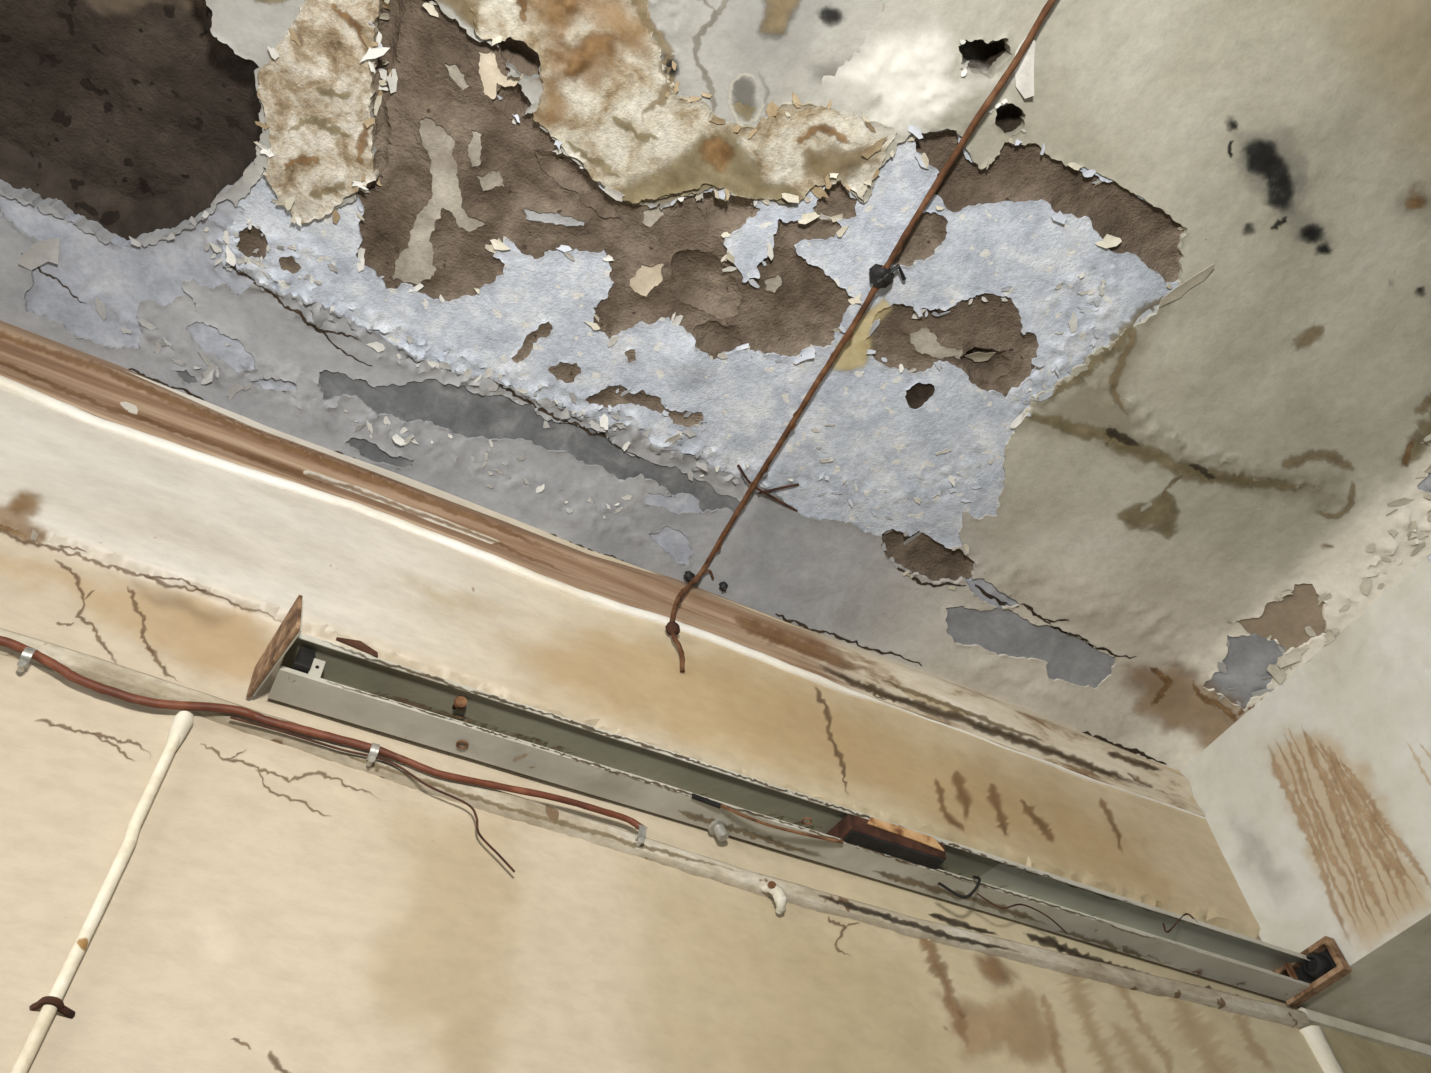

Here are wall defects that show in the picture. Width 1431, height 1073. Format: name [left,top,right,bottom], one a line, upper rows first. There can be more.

damp [1228,121,1294,229]
damp [1301,225,1331,253]
peeling [0,0,1215,688]
crack [0,529,249,676]
crack [42,719,141,759]
crack [210,747,368,815]
crack [817,690,847,784]
damp [1273,733,1427,923]